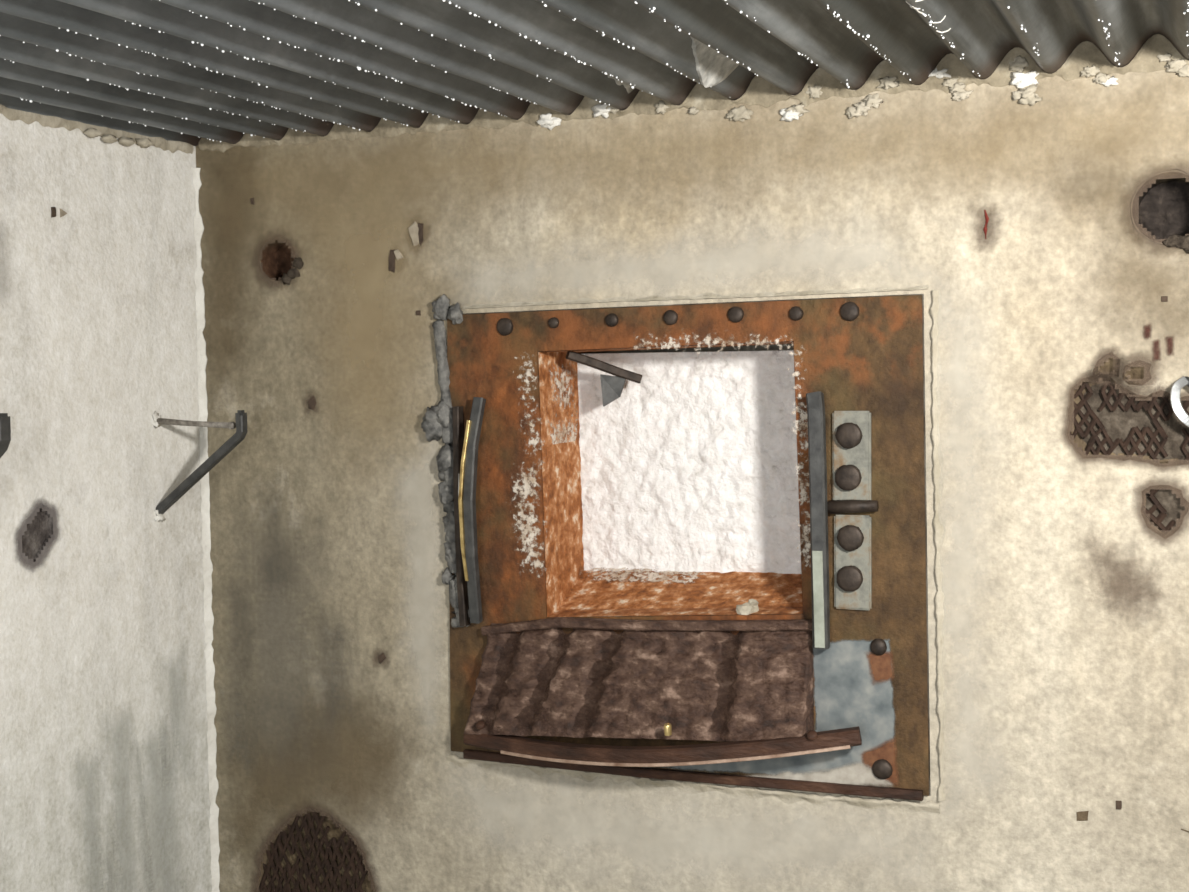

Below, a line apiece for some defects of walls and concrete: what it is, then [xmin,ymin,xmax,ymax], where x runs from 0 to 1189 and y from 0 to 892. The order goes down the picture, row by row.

spalling [1064,349,1189,542]
corrosion [867,652,893,682]
corrosion [862,739,898,785]
spalling [252,803,378,892]